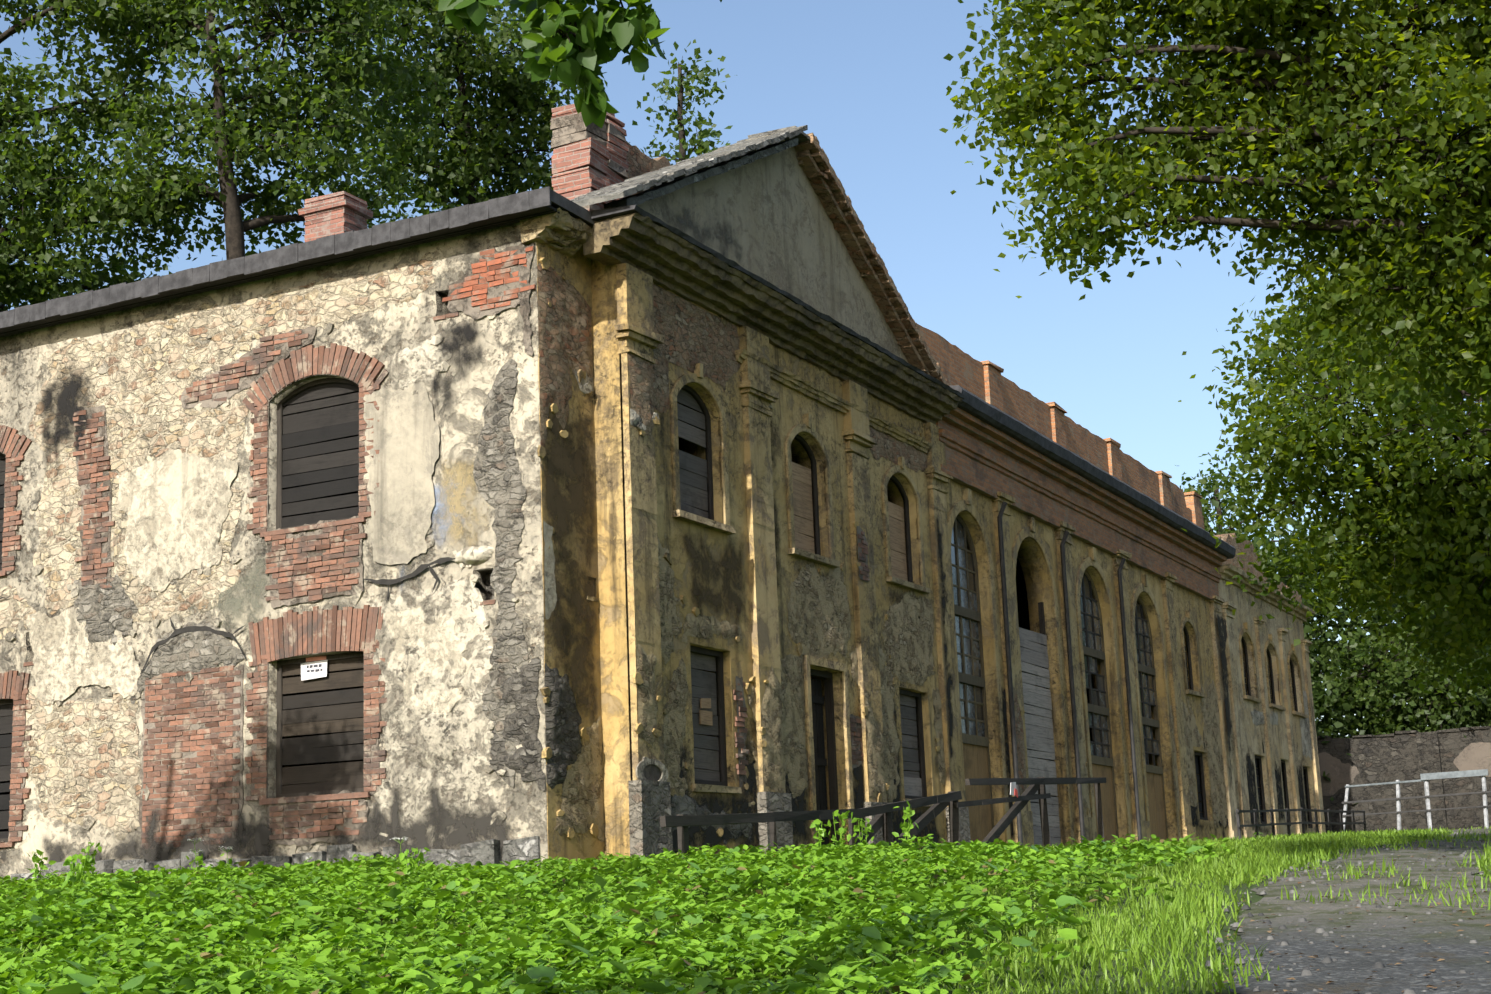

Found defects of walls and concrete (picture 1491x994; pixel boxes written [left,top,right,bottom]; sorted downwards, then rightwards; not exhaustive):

leakage [44,425,84,454]
flaking render [0,243,604,852]
crack [363,557,456,603]
leakage [683,535,745,644]